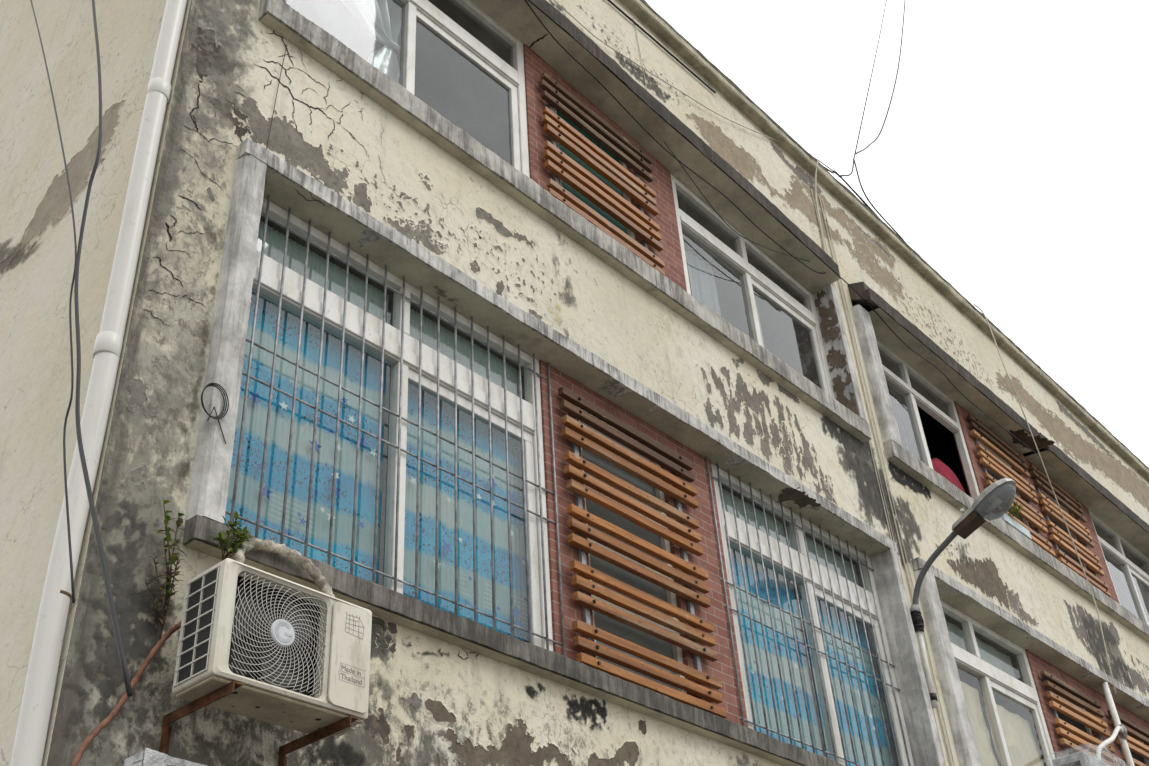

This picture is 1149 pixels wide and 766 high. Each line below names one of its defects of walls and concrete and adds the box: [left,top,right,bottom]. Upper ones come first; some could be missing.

water stain [144,0,256,258]
crack [181,30,396,194]
peeling [186,25,557,321]
crack [144,195,204,326]
peeling [576,4,1149,513]
peeling [372,615,399,659]
peeling [935,542,1039,627]
peeling [362,691,648,766]